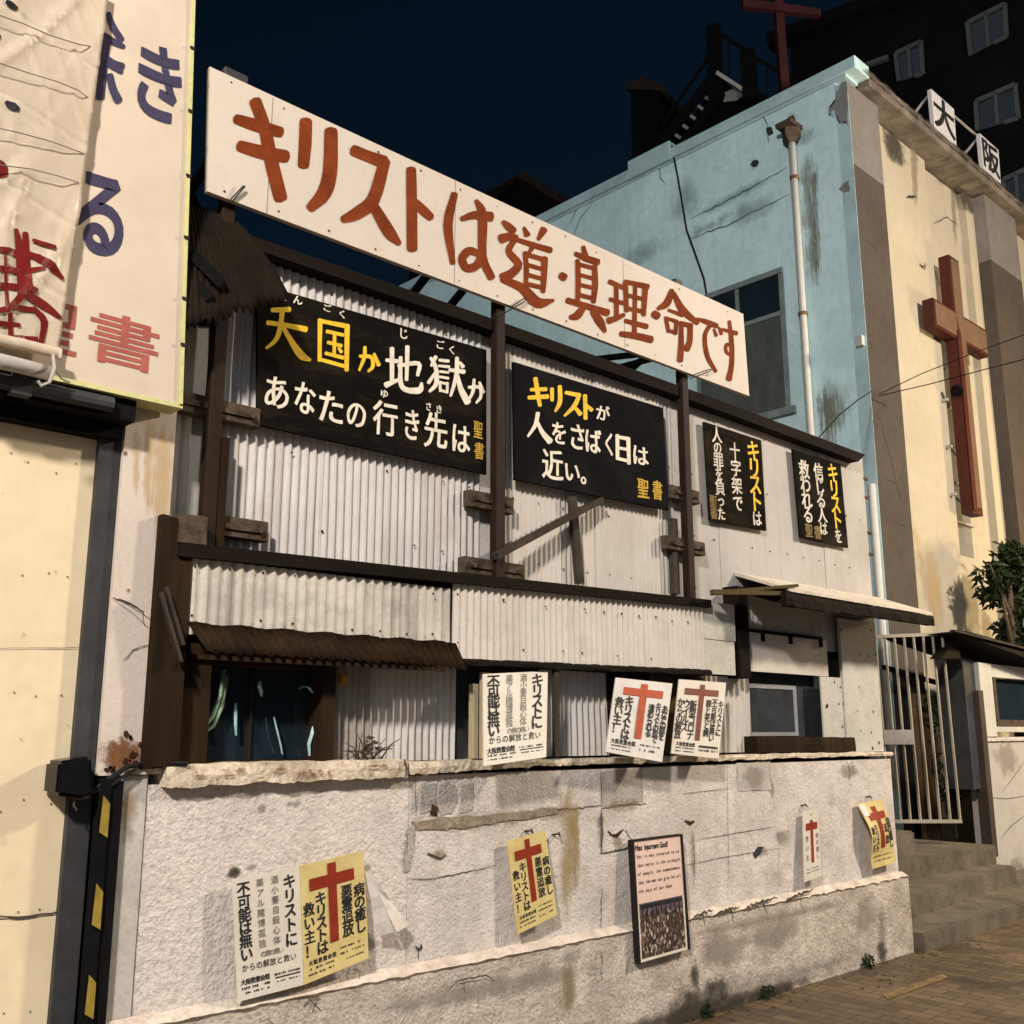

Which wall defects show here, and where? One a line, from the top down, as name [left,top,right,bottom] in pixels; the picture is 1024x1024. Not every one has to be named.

peeling [828,80,849,124]
crack [689,167,790,239]
rust [104,730,142,772]
damp [564,796,579,895]
damp [563,954,574,1008]